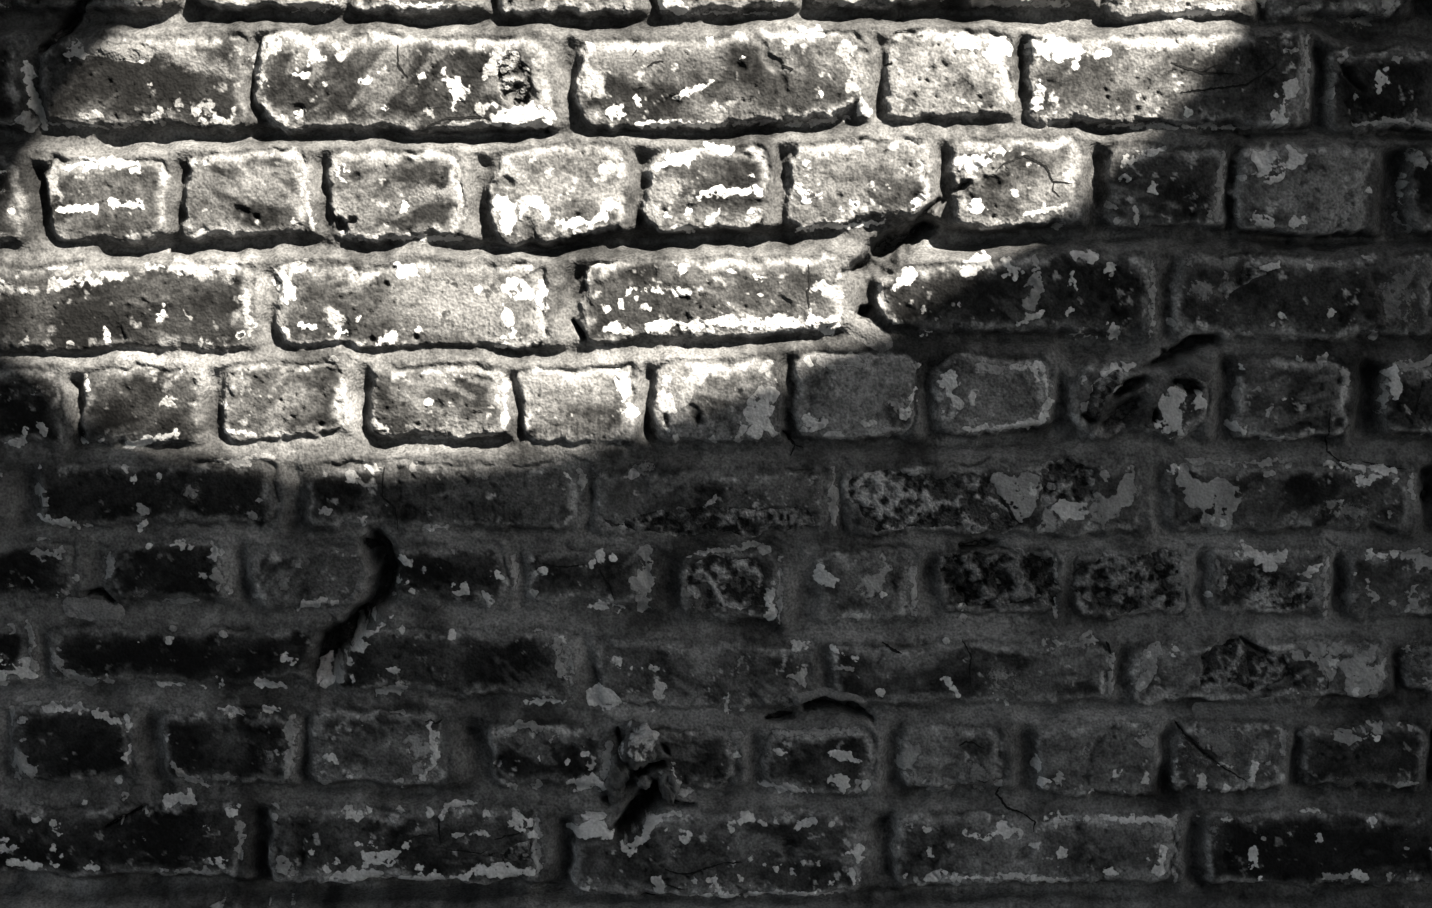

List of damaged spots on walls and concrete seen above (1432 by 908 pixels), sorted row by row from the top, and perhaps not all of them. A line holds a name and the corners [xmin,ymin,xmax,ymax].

peeling [953,147,1010,174]
peeling [651,174,763,234]
peeling [602,263,845,336]
peeling [959,249,1045,327]
peeling [656,356,714,443]
peeling [708,360,780,443]
peeling [937,359,1055,433]
spalling [587,458,1184,625]
spalling [1166,419,1331,617]
spalling [1199,638,1414,698]
peeling [727,639,871,834]
crack [1174,720,1247,782]